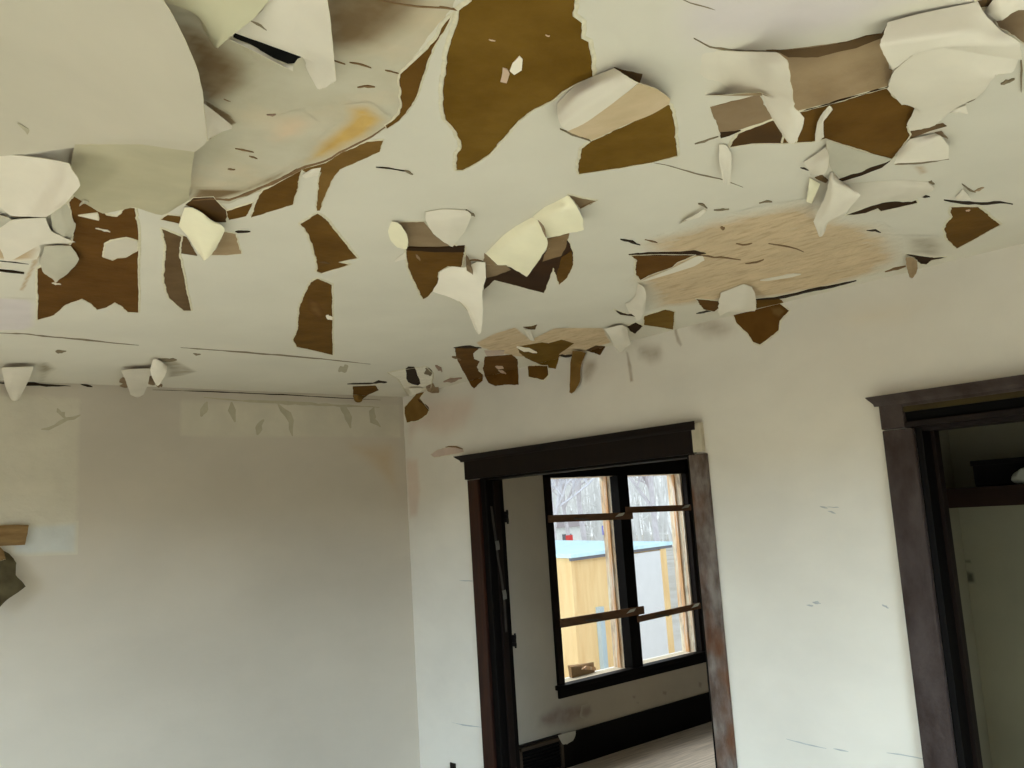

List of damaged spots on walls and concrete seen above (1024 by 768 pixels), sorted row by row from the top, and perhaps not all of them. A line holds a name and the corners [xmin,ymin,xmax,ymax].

peeling [906,257,918,278]
flaking render [387,365,462,396]